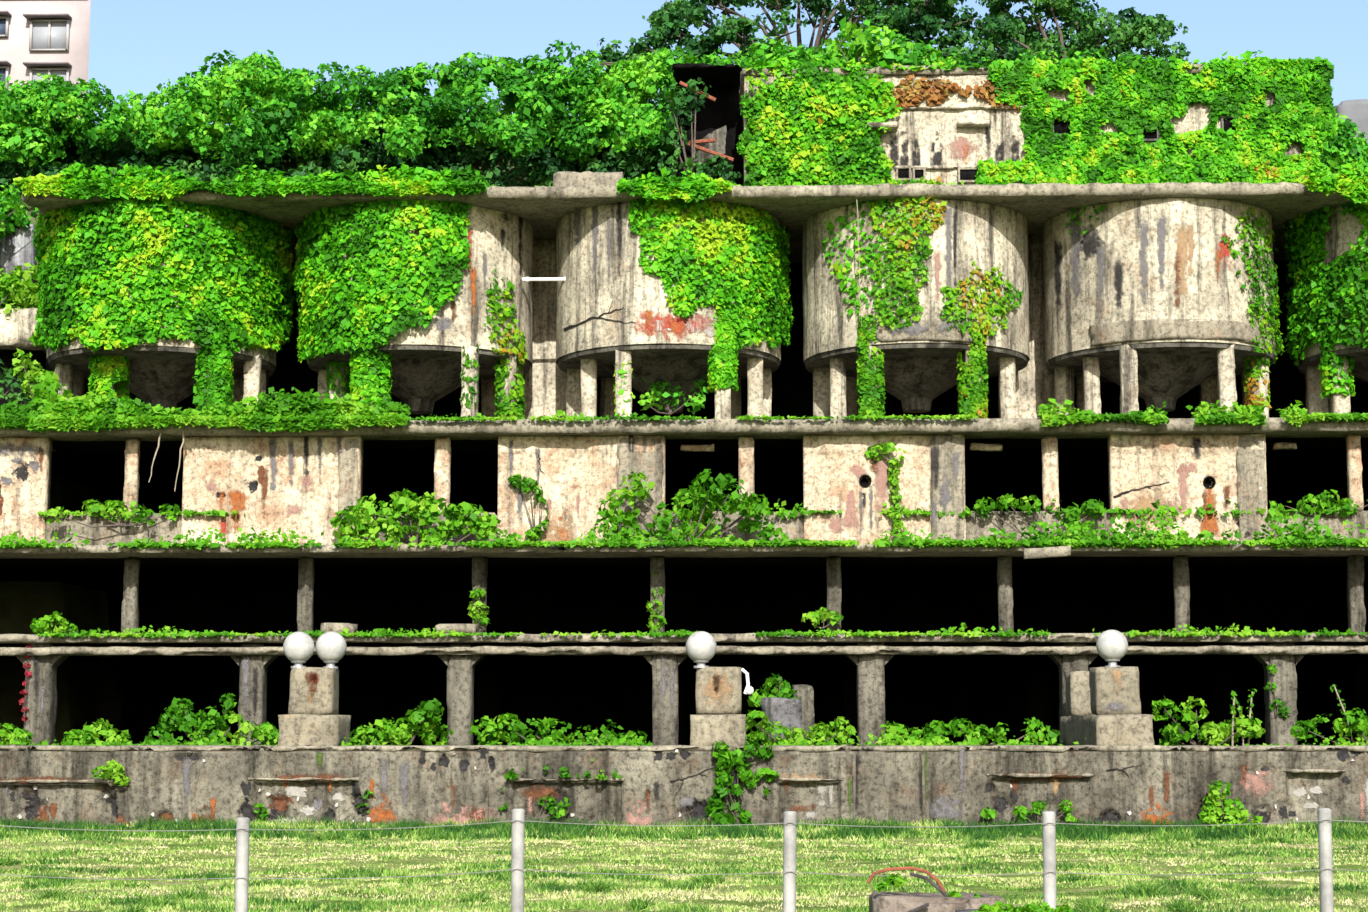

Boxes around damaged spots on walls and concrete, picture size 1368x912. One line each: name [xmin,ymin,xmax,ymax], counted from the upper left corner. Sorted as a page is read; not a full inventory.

water stain [1053,219,1123,317]
water stain [1139,216,1167,303]
rust [1175,224,1194,307]
rust [1216,234,1231,271]
rust [636,311,711,338]
rust [206,482,246,535]
rust [1121,463,1230,534]
rust [1240,765,1275,794]